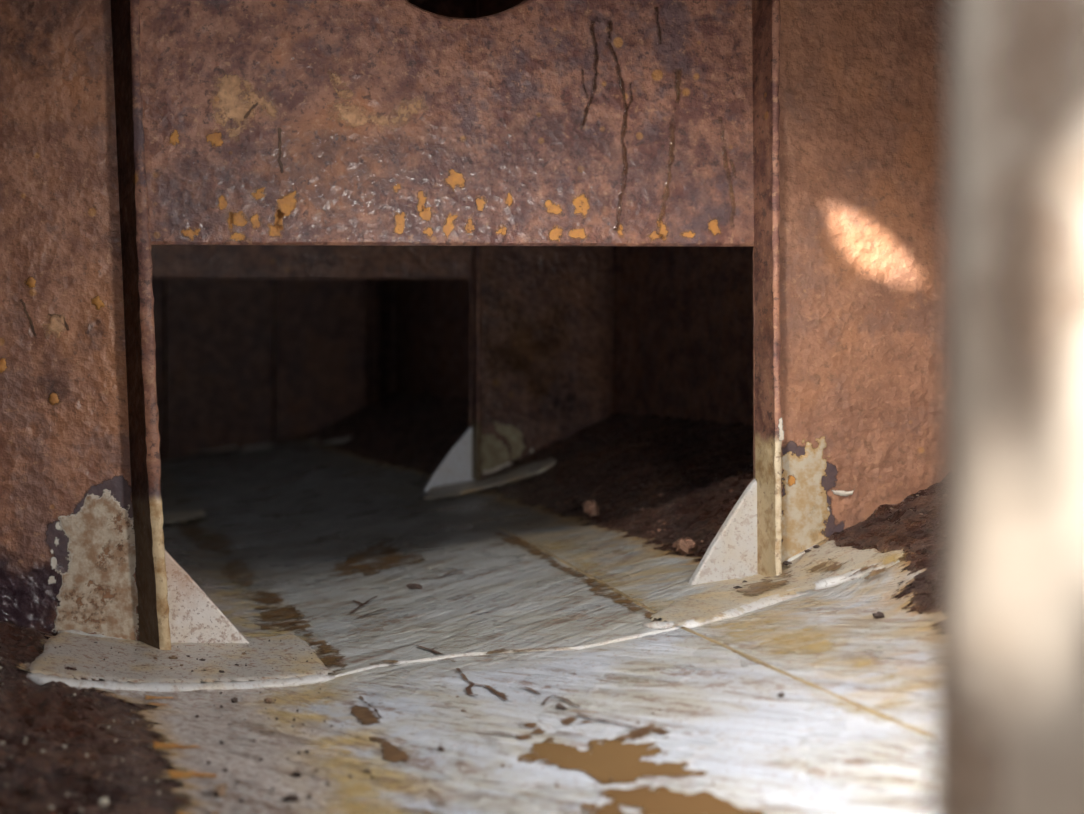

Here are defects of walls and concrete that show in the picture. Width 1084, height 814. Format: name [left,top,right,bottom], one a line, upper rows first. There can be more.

rust [580,21,633,236]
rust [445,169,465,189]
rust [648,119,674,242]
rust [218,187,297,241]
rust [394,212,405,234]
rust [417,191,485,238]
rust [545,194,590,241]
rust [708,219,721,235]
peeling [38,476,139,652]
peeling [63,418,939,814]